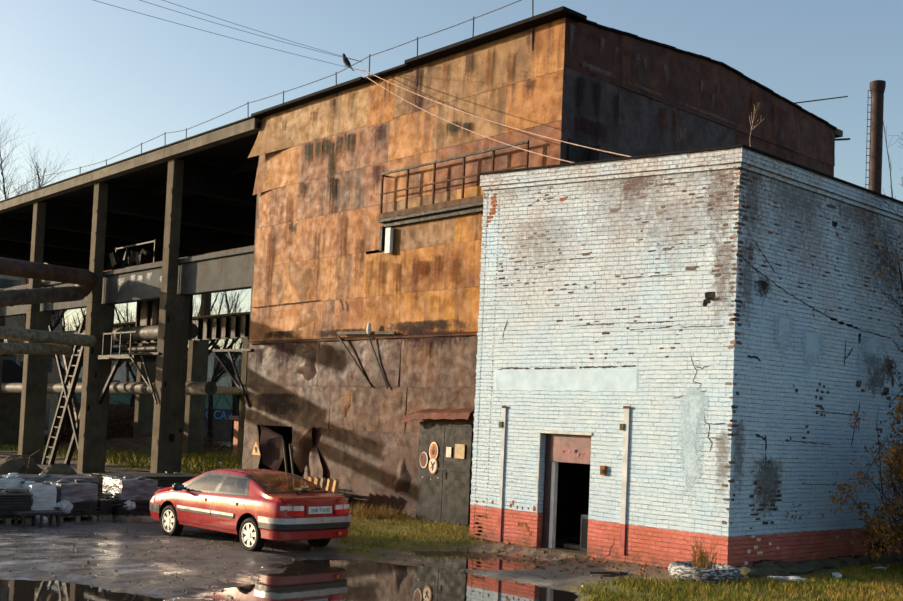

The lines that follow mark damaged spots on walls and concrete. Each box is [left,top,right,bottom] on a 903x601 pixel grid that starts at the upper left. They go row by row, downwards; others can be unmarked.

corrosion [411,255,458,298]
peeling [498,229,562,286]
crack [570,321,724,330]
peeling [620,168,782,349]
crack [743,242,901,365]
crack [674,354,726,452]
peeling [725,373,739,440]
peeling [722,461,736,525]